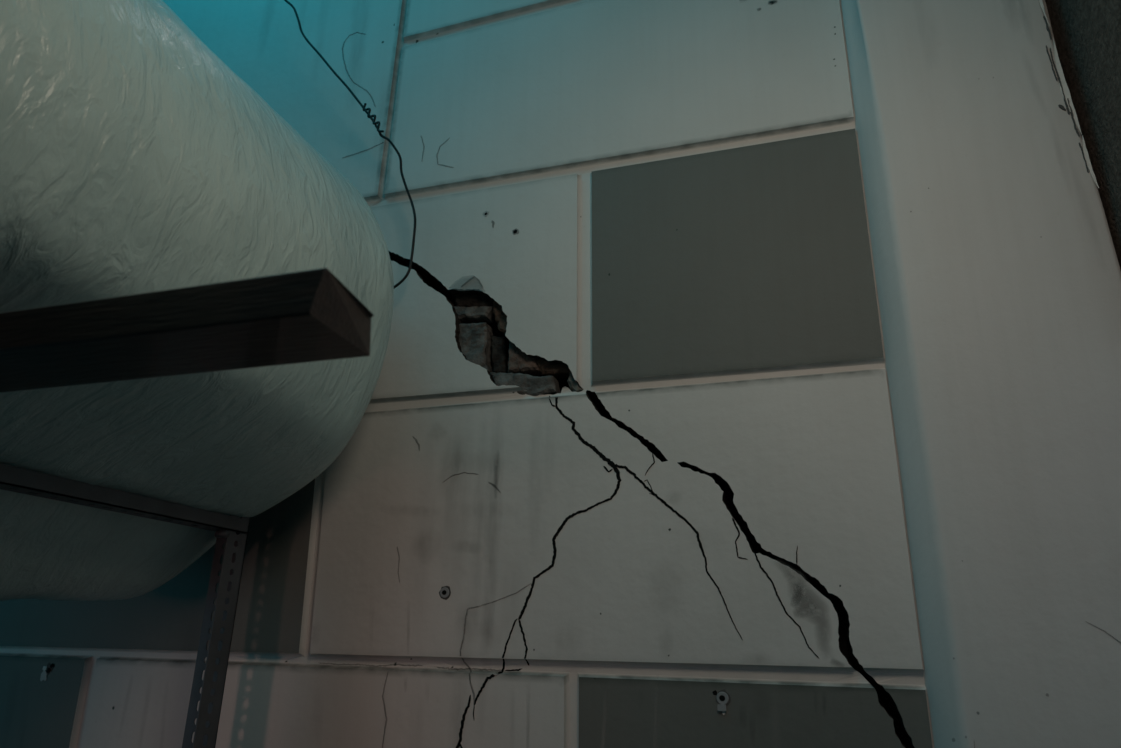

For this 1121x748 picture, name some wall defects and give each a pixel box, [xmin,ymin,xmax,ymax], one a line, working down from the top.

spalling [389,251,584,396]
crack [456,390,915,748]